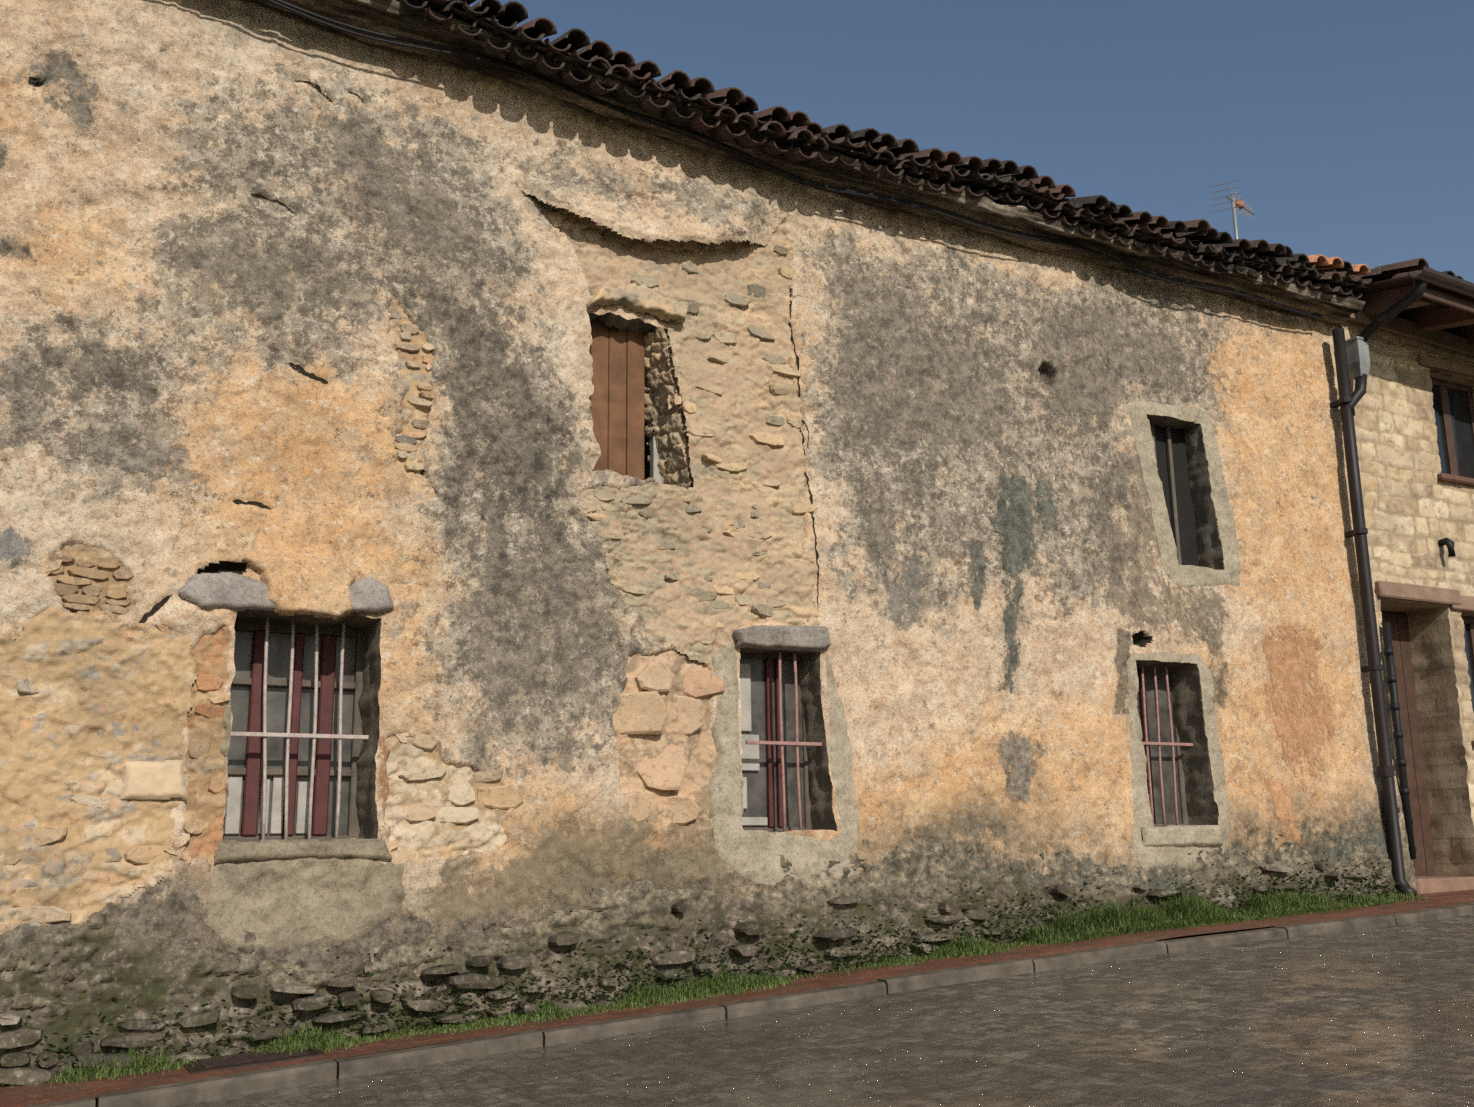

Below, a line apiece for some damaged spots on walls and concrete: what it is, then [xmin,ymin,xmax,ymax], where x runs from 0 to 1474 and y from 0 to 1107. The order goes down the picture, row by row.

damp [0,235,36,261]
crack [252,193,296,214]
damp [0,327,200,476]
crack [289,362,328,383]
spalling [387,296,436,499]
spalling [548,212,820,826]
crack [788,288,819,610]
damp [1030,297,1201,435]
damp [969,540,1025,697]
spalling [0,543,230,935]
spalling [381,732,524,866]
damp [0,872,214,958]